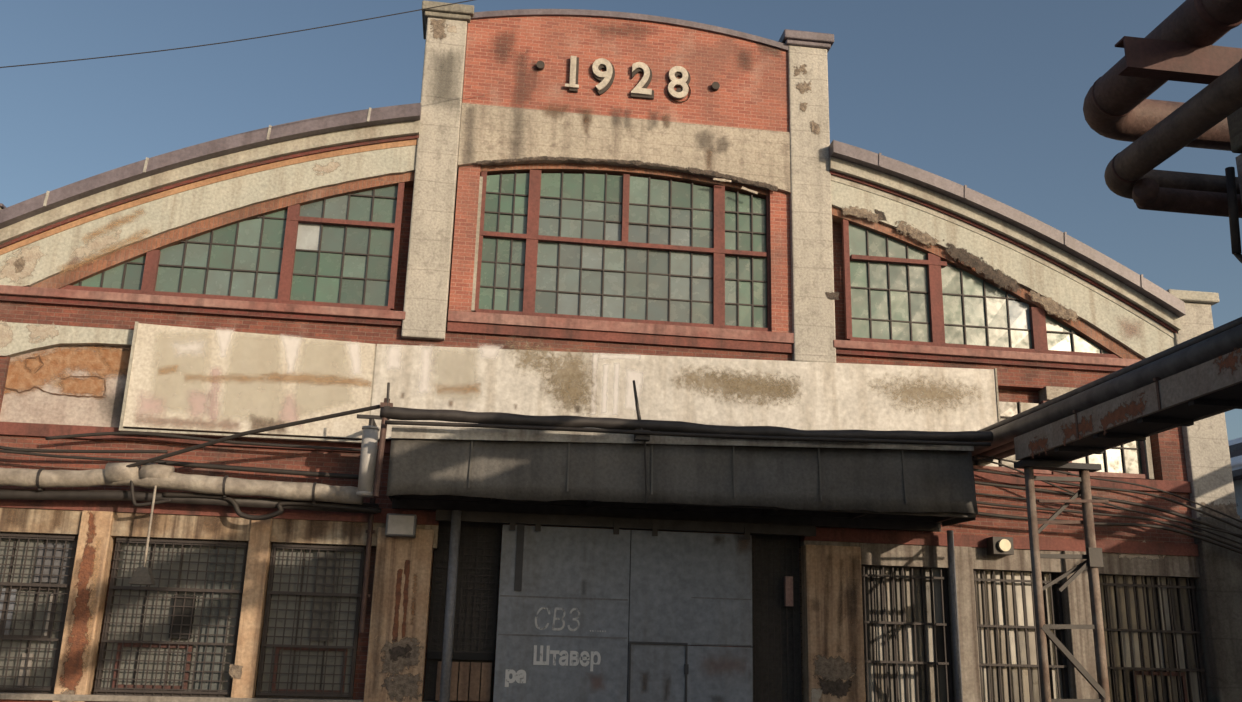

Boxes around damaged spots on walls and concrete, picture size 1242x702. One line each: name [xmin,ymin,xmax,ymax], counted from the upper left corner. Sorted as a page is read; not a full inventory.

spalling [793,64,821,134]
flaking render [0,246,45,284]
spalling [842,206,1078,322]
flaking render [0,320,131,398]
flaking render [59,511,98,702]
flaking render [381,560,422,702]
flaking render [811,655,857,702]